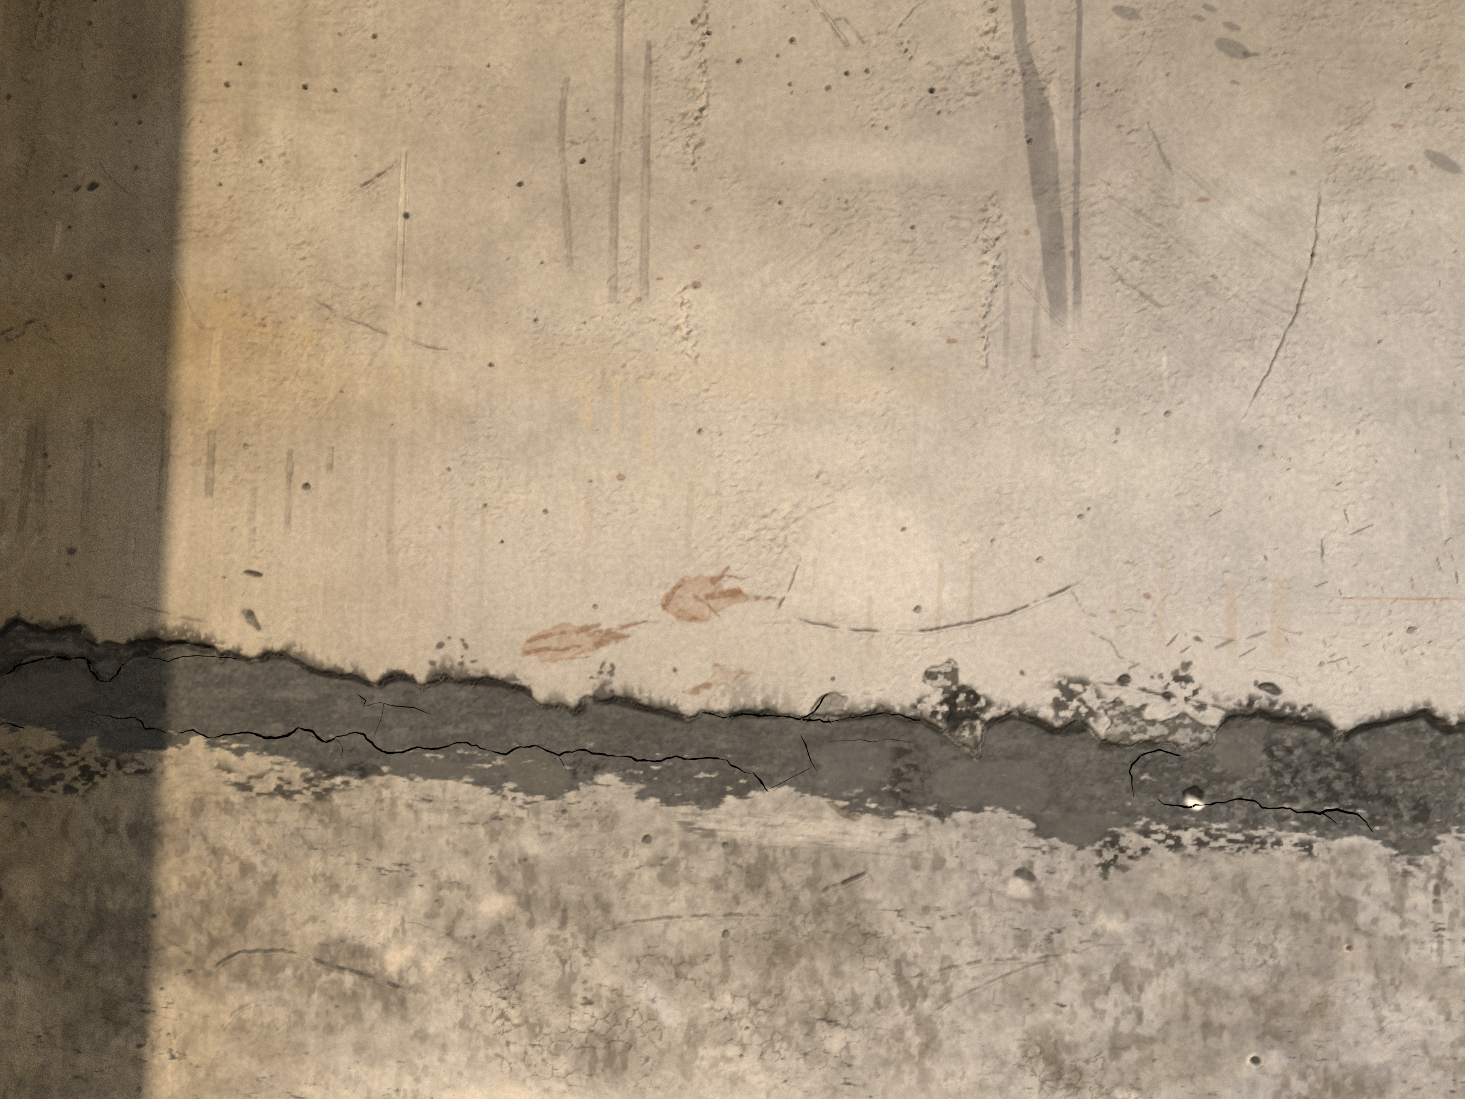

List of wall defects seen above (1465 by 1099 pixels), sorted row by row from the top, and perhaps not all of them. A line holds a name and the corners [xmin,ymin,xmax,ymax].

damp [557,74,576,292]
damp [607,0,654,320]
damp [1010,0,1084,383]
corrosion [519,565,781,665]
crack [6,648,920,791]
corrosion [680,662,754,698]
spalling [808,690,850,722]
spalling [921,657,983,757]
spalling [1069,590,1217,753]
spalling [1256,681,1284,694]
flaking render [1181,784,1208,813]
crack [1129,749,1374,833]